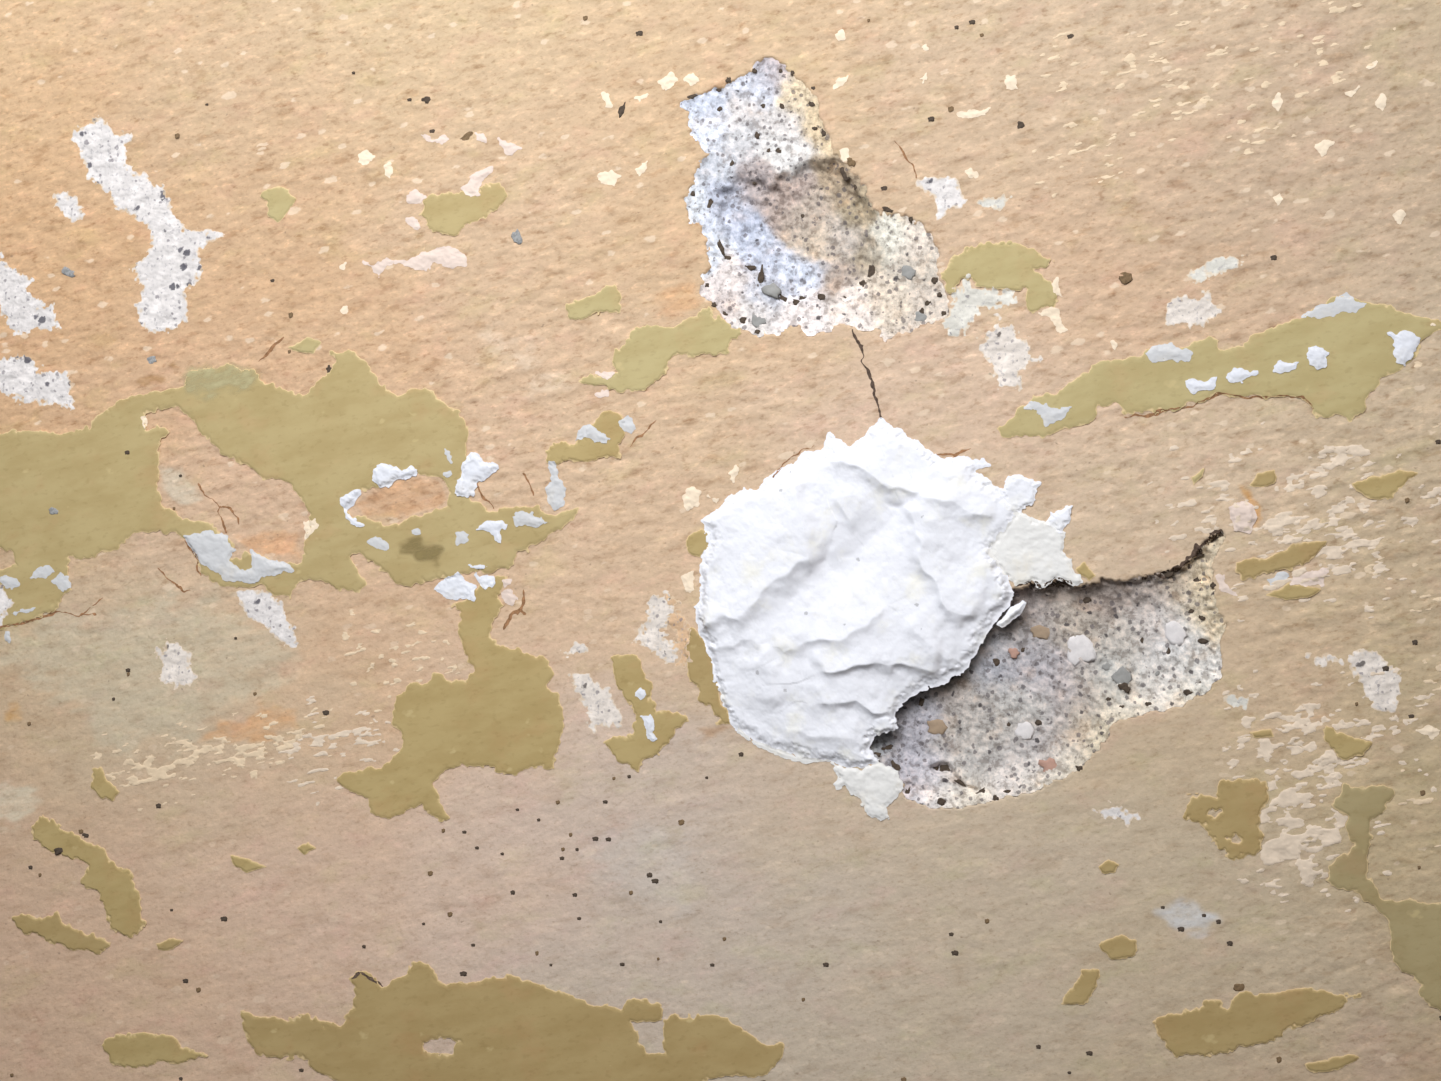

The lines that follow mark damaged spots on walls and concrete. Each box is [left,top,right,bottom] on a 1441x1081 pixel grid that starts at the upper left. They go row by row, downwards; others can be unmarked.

flaking render [71,114,225,334]
flaking render [634,58,1072,427]
flaking render [0,251,62,336]
flaking render [1145,255,1329,394]
flaking render [0,353,75,411]
crack [852,329,882,419]
flaking render [340,463,418,551]
flaking render [443,448,499,498]
flaking render [455,461,566,546]
flaking render [183,530,299,648]
flaking render [434,564,518,606]
flaking render [737,445,1441,903]